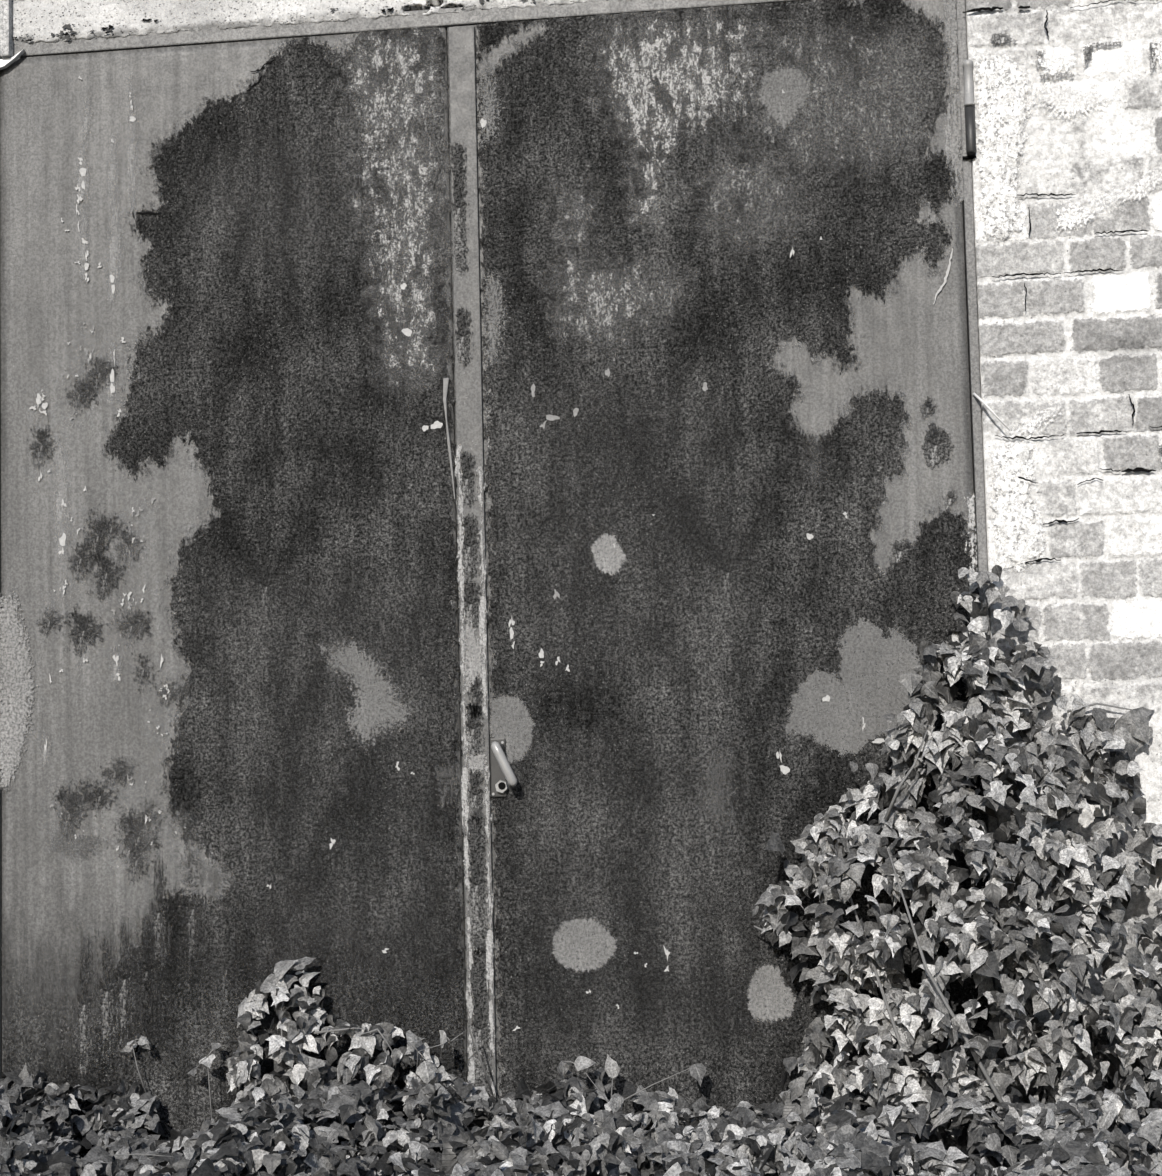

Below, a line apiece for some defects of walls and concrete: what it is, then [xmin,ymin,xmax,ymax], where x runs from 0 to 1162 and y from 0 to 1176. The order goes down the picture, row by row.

damp [1038,47,1094,119]
damp [1055,203,1095,234]
corrosion [27,390,60,481]
corrosion [37,26,468,1073]
corrosion [475,0,979,1138]
corrosion [953,670,984,706]
corrosion [965,775,987,828]
corrosion [949,842,989,892]
corrosion [946,975,995,1033]
corrosion [209,1079,241,1123]